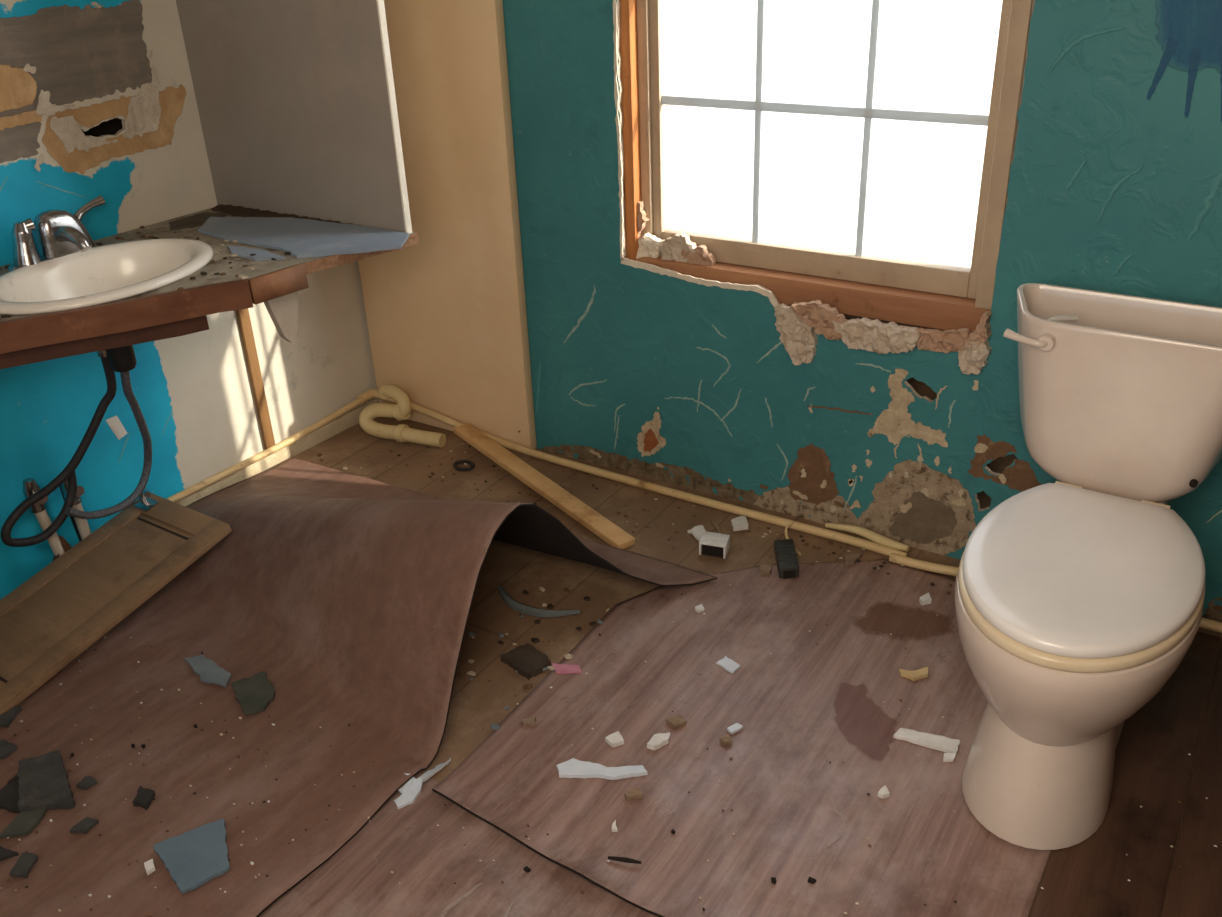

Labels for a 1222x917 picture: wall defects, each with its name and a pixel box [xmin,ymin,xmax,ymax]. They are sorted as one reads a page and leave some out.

spalling [42,83,186,174]
spalling [613,0,992,375]
peeling [637,407,666,468]
flaking render [753,434,1041,556]